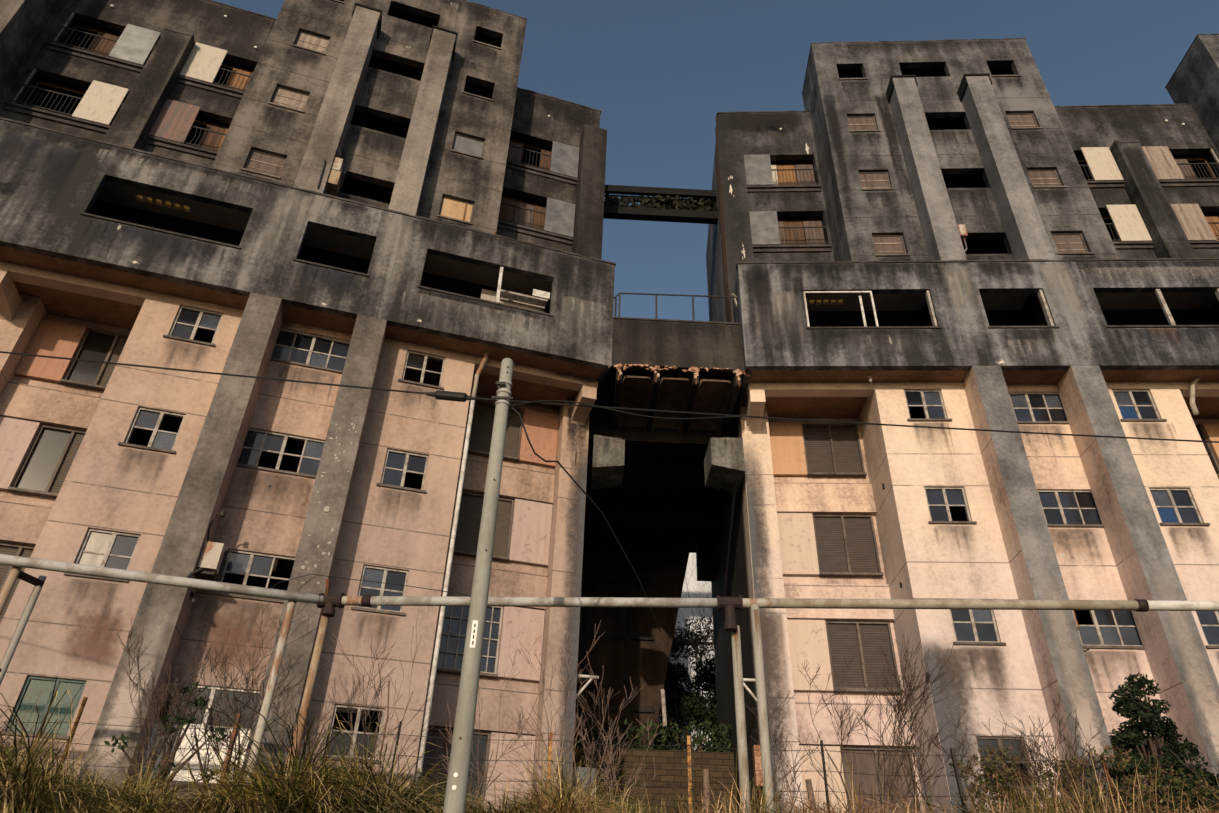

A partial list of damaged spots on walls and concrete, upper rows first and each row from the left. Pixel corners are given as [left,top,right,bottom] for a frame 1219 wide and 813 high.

leakage [0,121,236,185]
leakage [1125,148,1219,203]
leakage [438,293,538,322]
spalling [608,363,750,387]
leakage [745,463,783,807]
leakage [923,647,978,813]